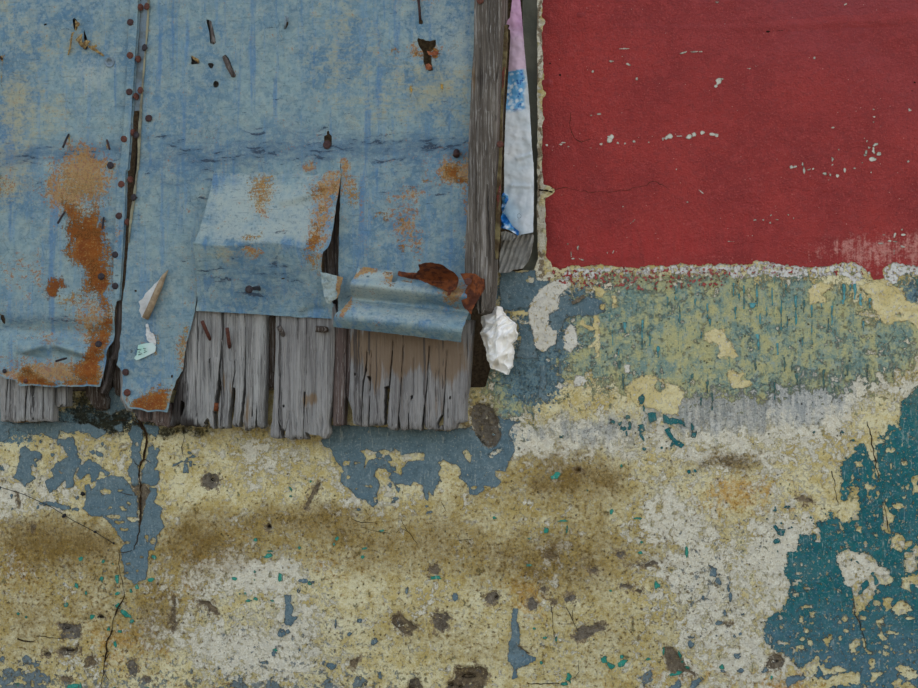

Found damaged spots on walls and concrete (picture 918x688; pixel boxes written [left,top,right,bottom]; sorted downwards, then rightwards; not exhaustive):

rust [440,161,469,186]
rust [303,223,324,270]
rust [17,170,114,386]
rust [386,271,420,287]
peeling [856,271,918,329]
rust [125,382,173,410]
peeling [609,364,697,451]
peeling [0,413,165,648]
crack [101,414,150,688]
spalling [766,495,813,552]
peeling [0,623,96,688]
spalling [447,666,488,688]